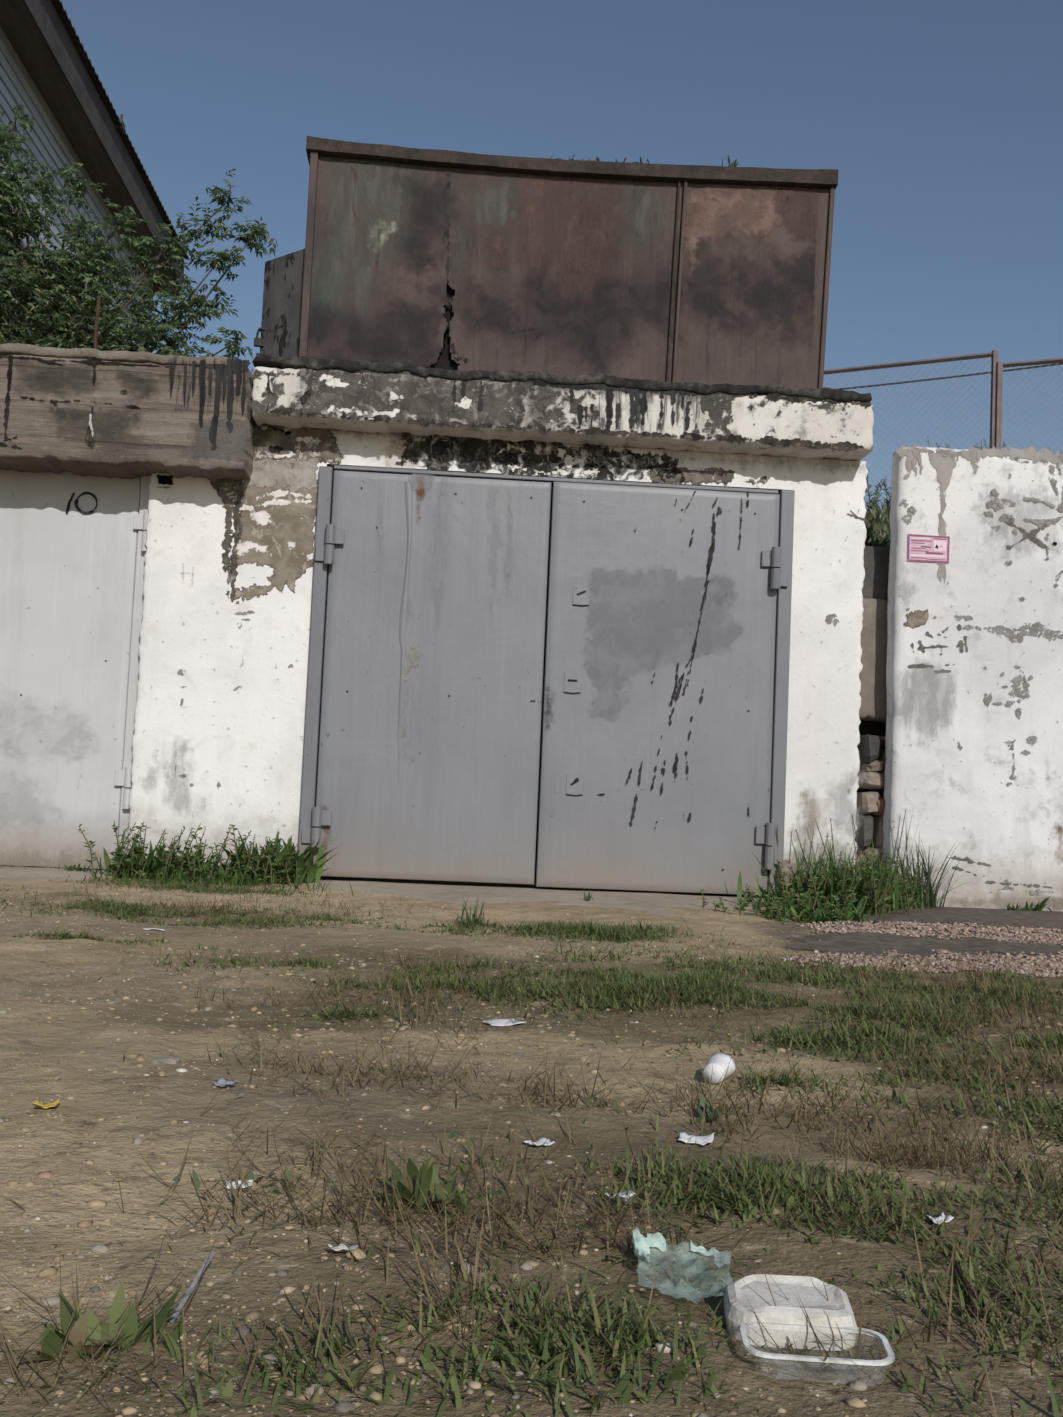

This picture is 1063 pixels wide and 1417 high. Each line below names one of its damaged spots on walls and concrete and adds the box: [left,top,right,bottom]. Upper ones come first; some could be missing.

rust [684,183,818,266]
damp [28,366,137,441]
damp [170,359,280,459]
flaking render [210,370,726,629]
flaking render [650,458,768,486]
damp [901,446,979,536]
peeling [984,457,1063,587]
damp [937,563,949,584]
spalling [904,608,1063,643]
peeling [984,665,1033,719]
peeling [1006,736,1037,786]